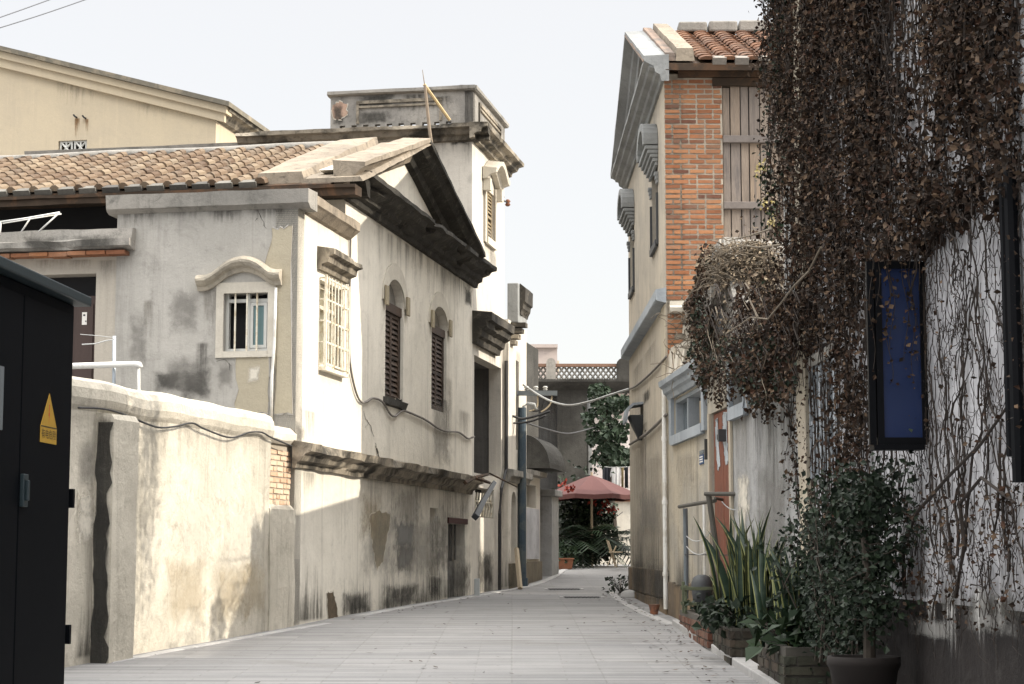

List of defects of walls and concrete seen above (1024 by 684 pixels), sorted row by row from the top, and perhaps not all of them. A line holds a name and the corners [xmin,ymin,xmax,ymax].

flaking render [331,100,348,121]
damp [158,372,206,395]
damp [79,421,114,663]
peeling [369,510,414,570]
flaking render [326,591,338,619]
damp [346,595,367,614]